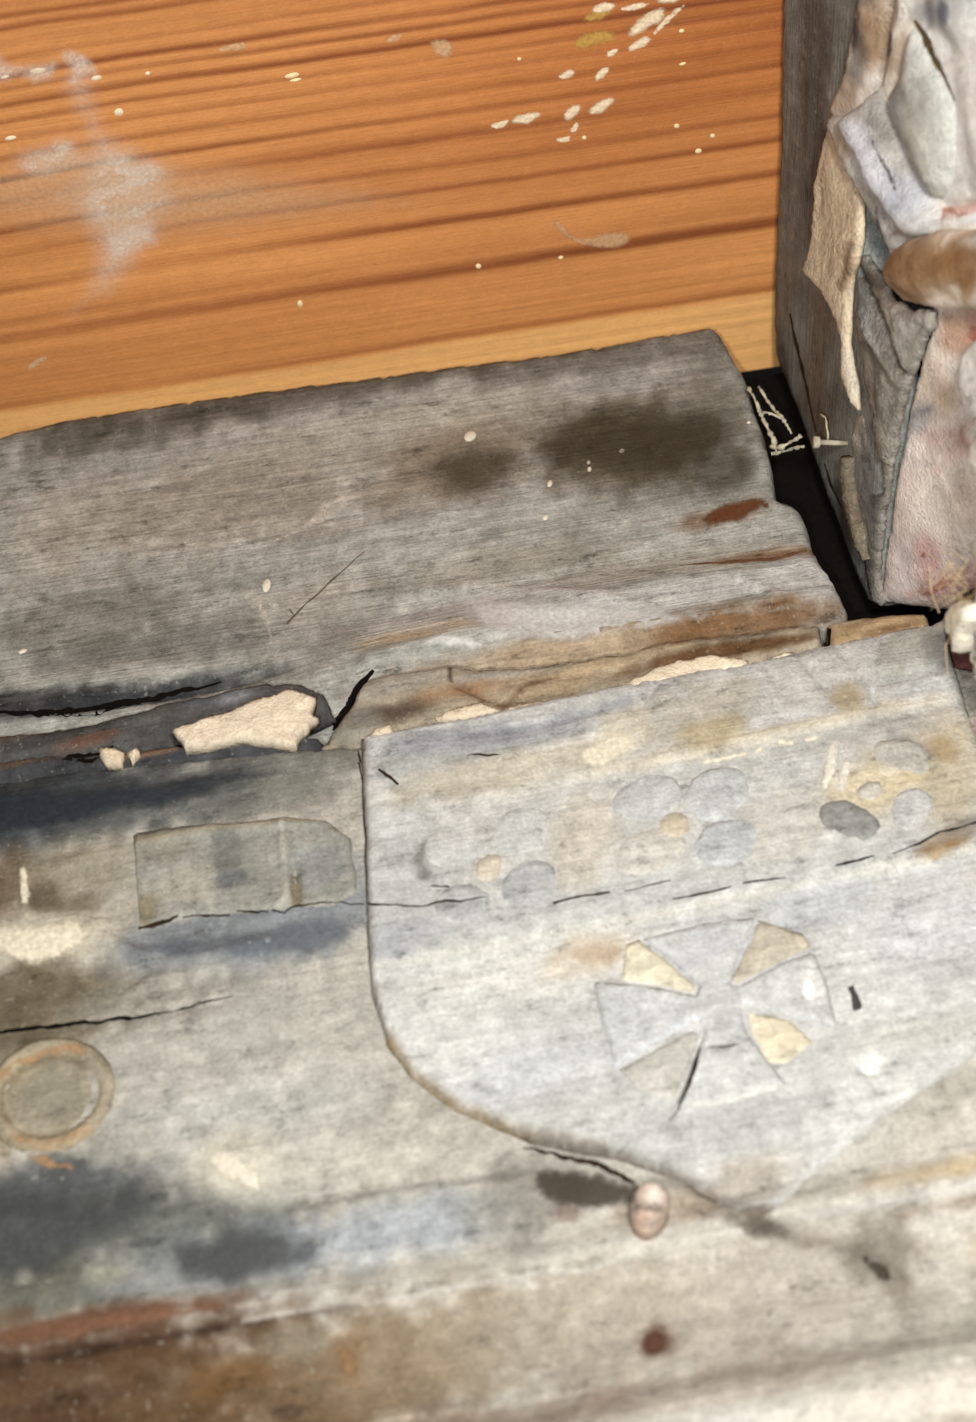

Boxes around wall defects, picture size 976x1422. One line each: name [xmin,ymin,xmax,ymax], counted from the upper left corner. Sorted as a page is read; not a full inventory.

rust [704,499,768,524]
crack [0,681,221,763]
peeling [173,689,319,755]
crack [0,995,232,1034]